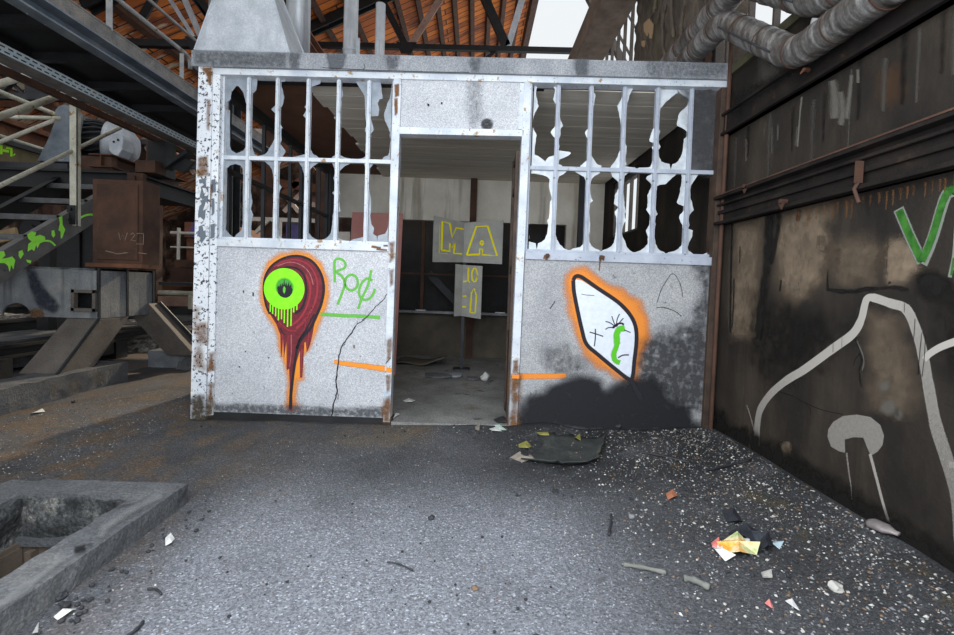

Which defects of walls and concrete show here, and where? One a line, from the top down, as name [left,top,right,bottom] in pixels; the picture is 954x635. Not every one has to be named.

corrosion [198,157,208,176]
corrosion [713,107,954,198]
crack [331,294,387,416]
corrosion [509,360,521,426]